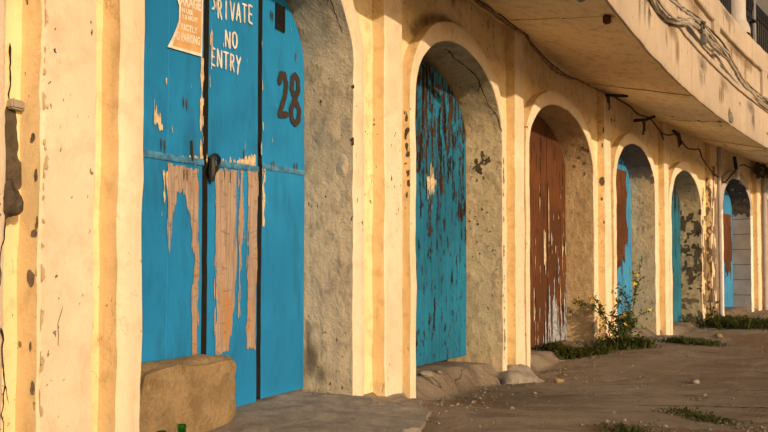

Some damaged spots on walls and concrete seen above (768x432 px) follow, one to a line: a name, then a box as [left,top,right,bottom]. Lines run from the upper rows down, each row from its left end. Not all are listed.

crack [445,49,502,131]
peeling [427,169,436,195]
spalling [726,179,751,218]
peeling [680,166,717,321]